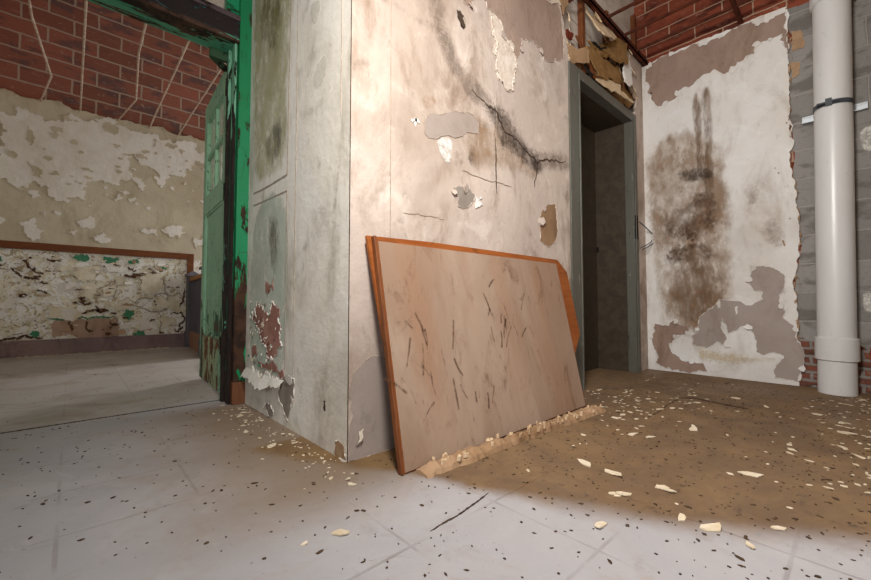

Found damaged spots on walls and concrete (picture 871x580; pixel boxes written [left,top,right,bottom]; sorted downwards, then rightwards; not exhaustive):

spalling [457,0,473,29]
peeling [0,106,223,244]
peeling [140,225,203,249]
peeling [424,111,479,139]
peeling [451,183,483,209]
crack [466,89,566,192]
flaking render [485,0,818,388]
leakage [651,89,727,329]
flaking render [851,0,871,394]
peeling [0,254,186,342]
peeling [241,194,295,421]